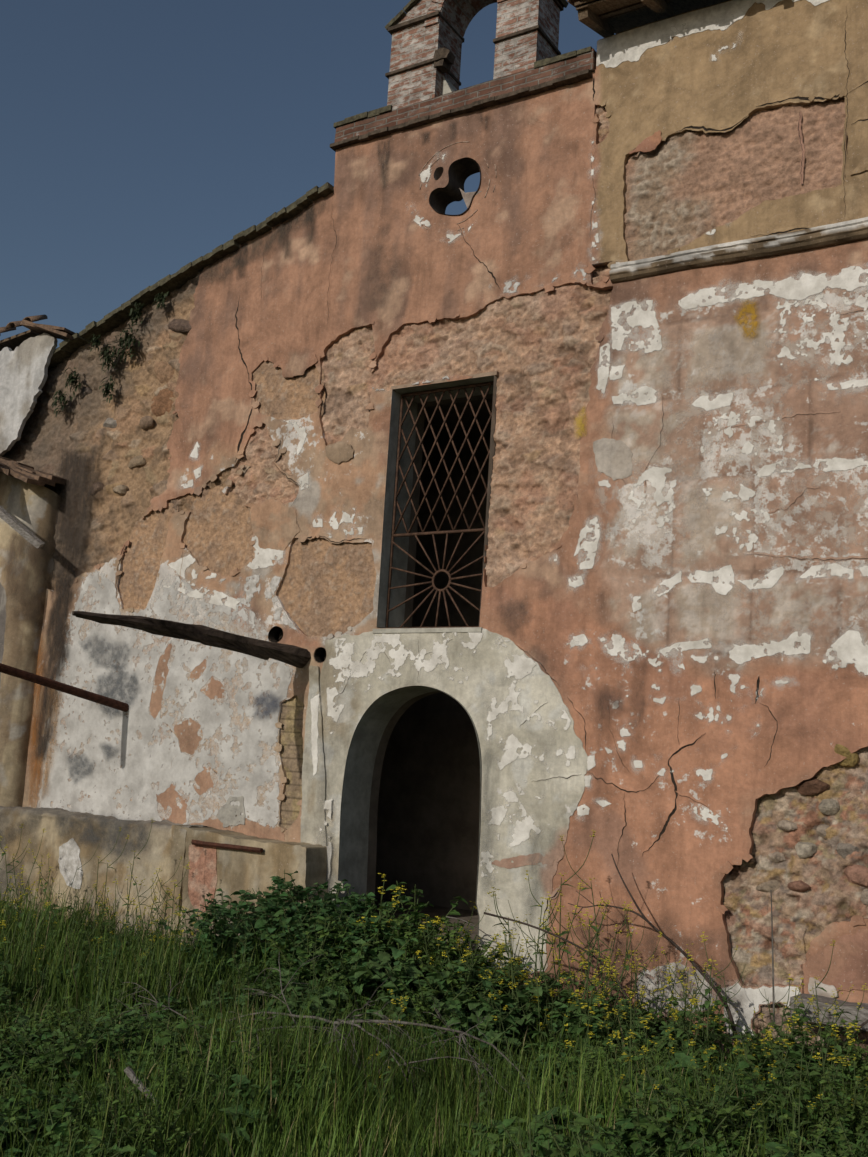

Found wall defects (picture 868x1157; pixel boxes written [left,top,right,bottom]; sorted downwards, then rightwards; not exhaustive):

crack [675,6,868,237]
crack [234,292,255,462]
spalling [2,91,868,842]
peeling [320,799,332,882]
peeling [480,781,563,877]
crack [515,643,710,869]
spalling [636,744,868,1076]